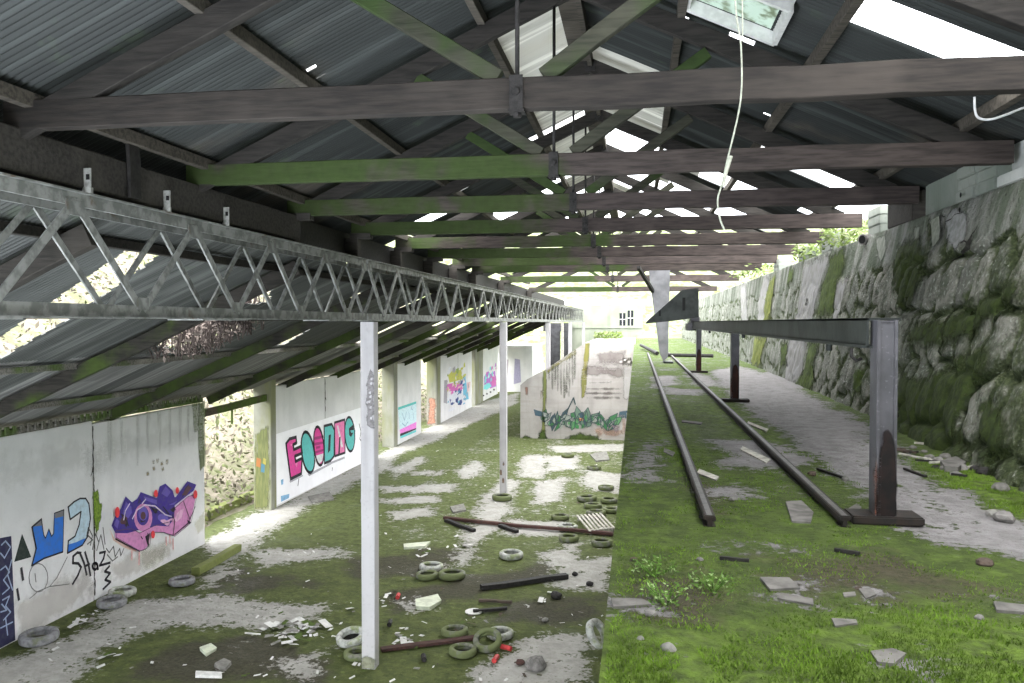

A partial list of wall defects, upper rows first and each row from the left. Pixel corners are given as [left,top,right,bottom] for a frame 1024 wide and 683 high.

water stain [541,343,632,431]
rust [730,365,739,399]
rust [874,430,898,517]